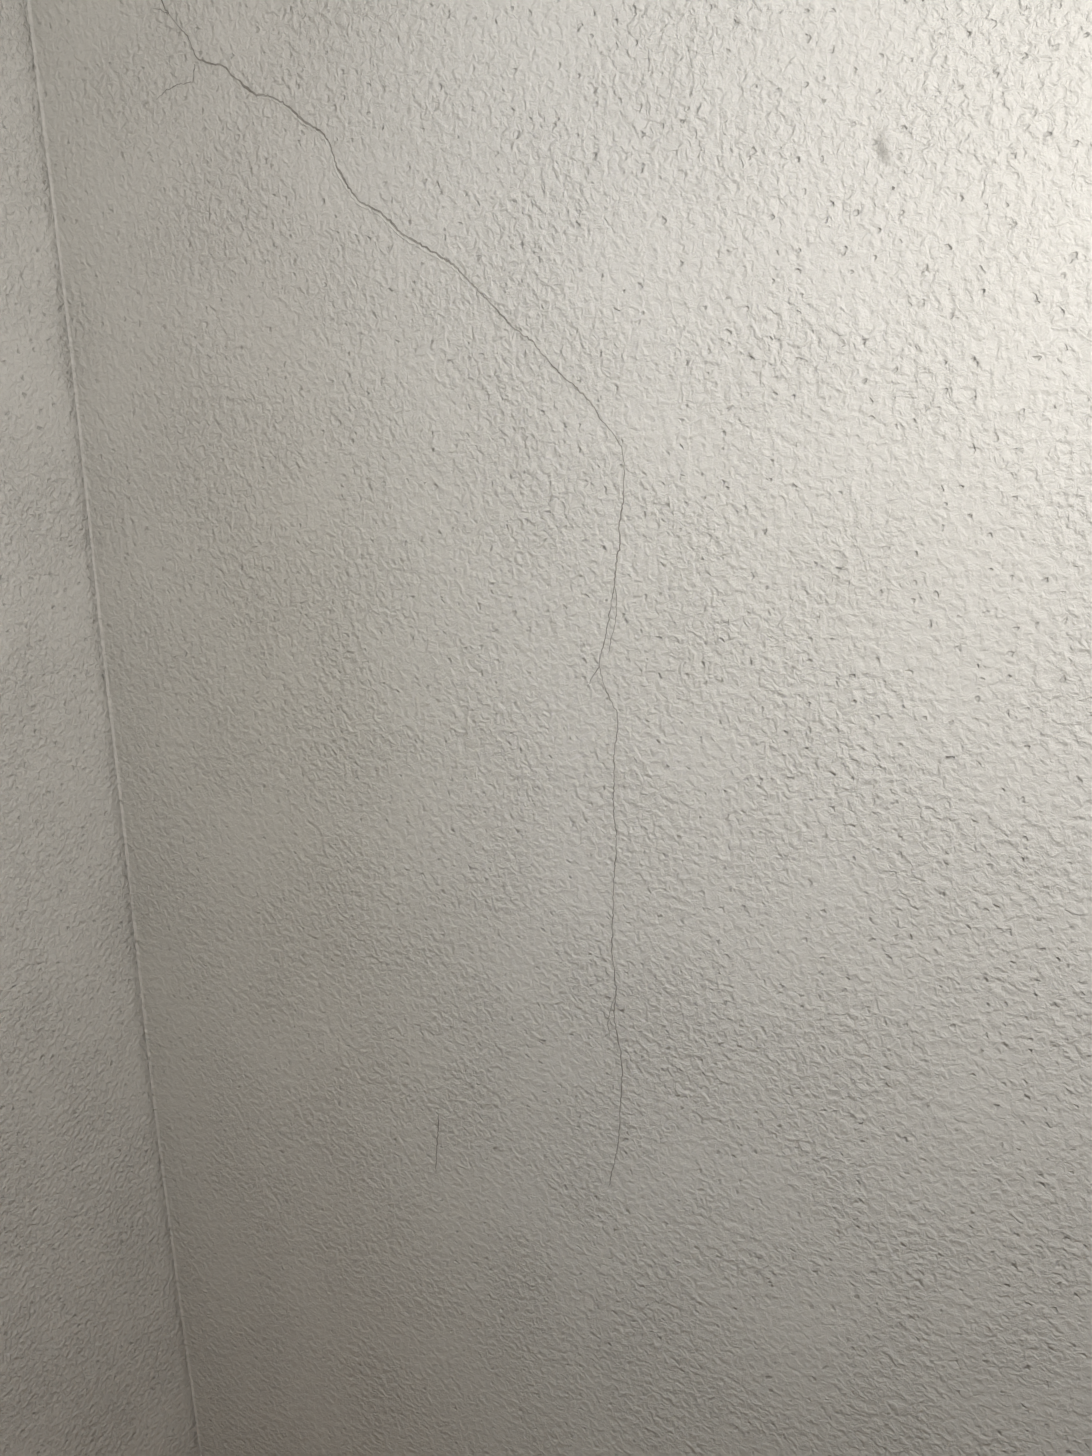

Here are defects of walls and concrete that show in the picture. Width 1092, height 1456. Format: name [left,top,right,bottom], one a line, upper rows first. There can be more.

crack [157,0,625,1186]